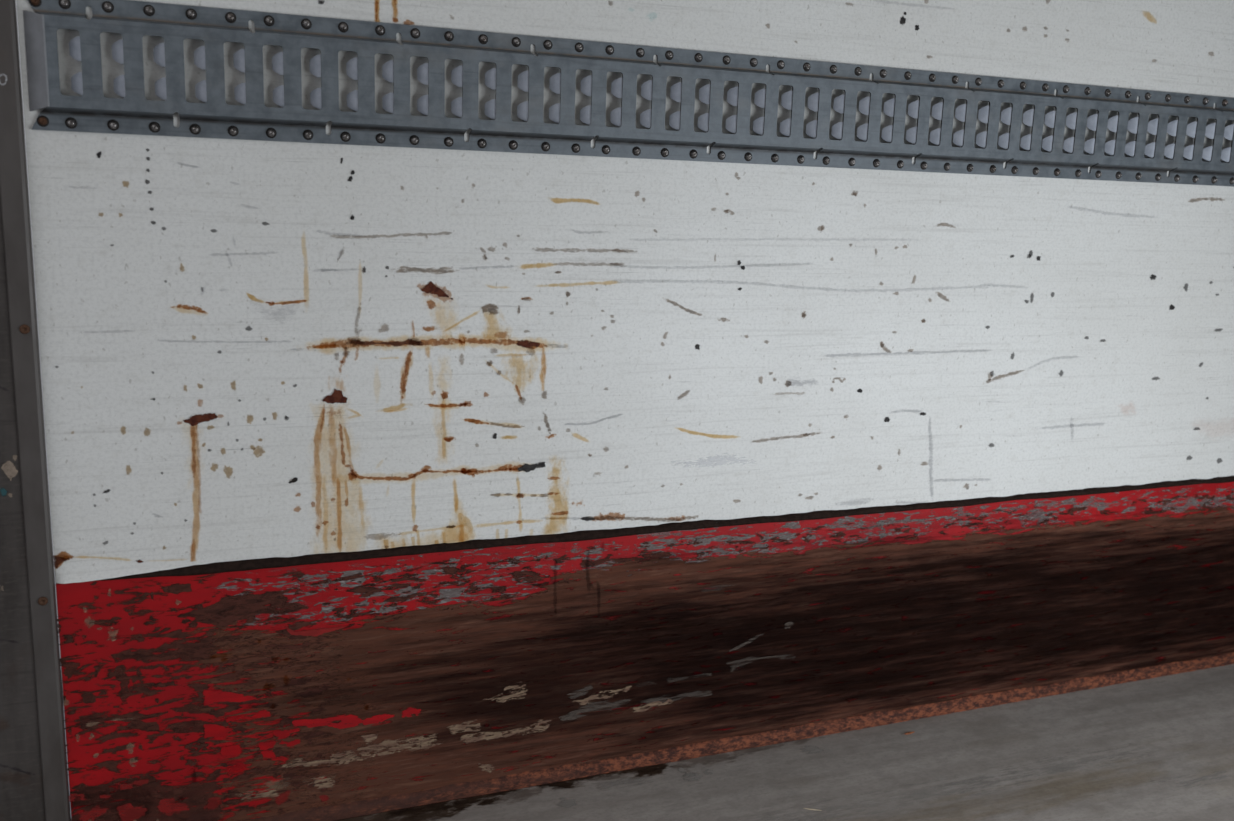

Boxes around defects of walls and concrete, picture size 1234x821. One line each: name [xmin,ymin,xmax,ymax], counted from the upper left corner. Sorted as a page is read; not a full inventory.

corrosion [326,338,540,398]
corrosion [184,413,217,426]
corrosion [322,389,347,404]
corrosion [340,433,523,481]
peeling [53,552,73,569]
peeling [57,504,1234,821]